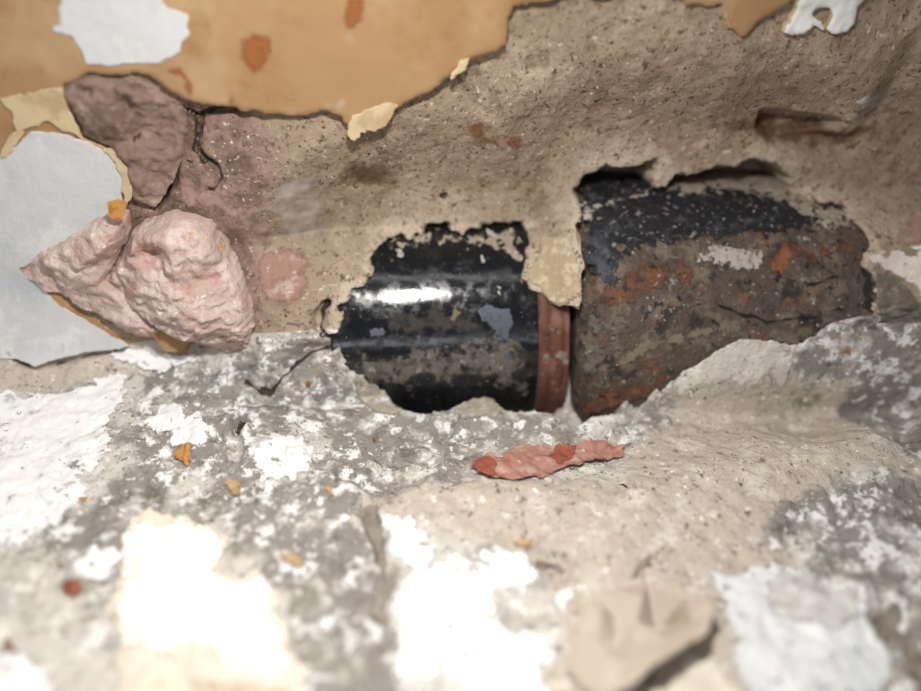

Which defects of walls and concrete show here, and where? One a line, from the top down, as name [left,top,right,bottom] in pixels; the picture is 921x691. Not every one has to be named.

crack [182,105,230,185]
flaking render [0,0,921,548]
corrosion [591,260,700,307]
corrosion [764,238,869,275]
corrosion [579,375,669,418]